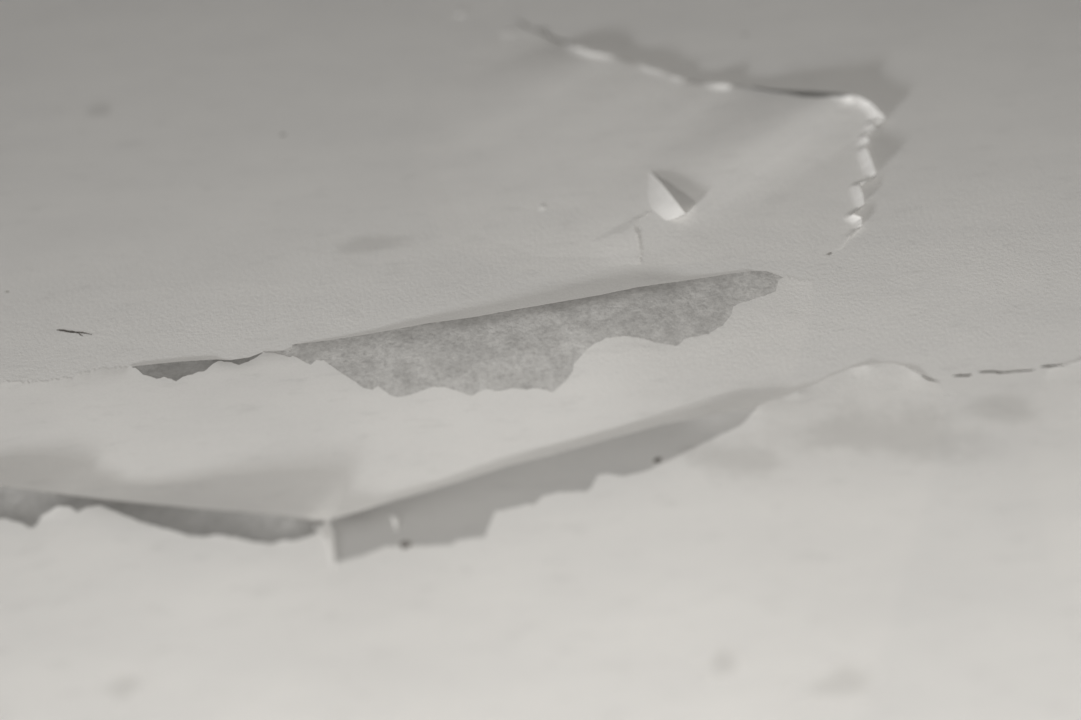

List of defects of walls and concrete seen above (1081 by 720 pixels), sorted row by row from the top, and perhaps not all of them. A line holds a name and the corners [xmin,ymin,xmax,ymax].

peeling [429,29,885,257]
peeling [0,271,944,720]